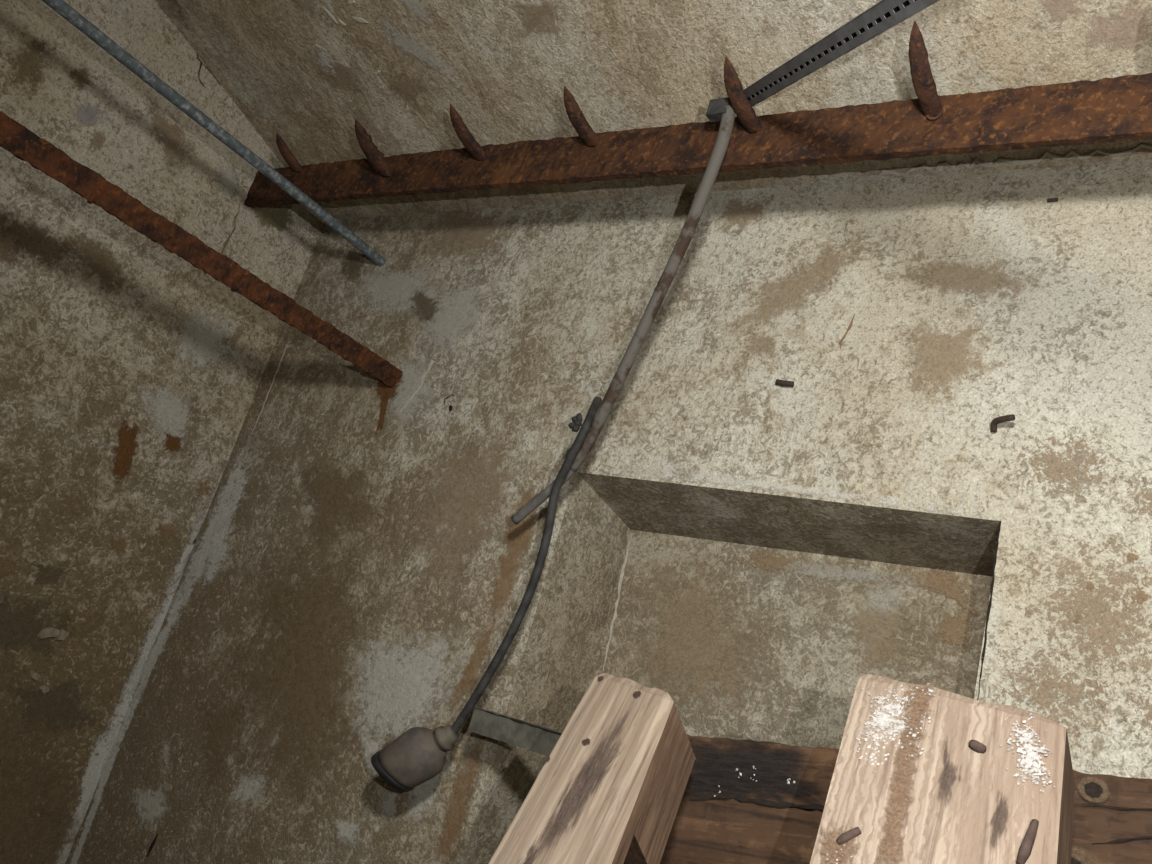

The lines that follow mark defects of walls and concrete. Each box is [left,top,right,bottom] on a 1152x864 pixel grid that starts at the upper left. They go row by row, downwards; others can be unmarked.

rust [0,111,403,431]
rust [113,420,138,484]
rust [166,434,181,451]
leakage [56,446,257,864]
leakage [201,558,455,803]
leakage [382,751,450,820]
leakage [336,821,360,843]